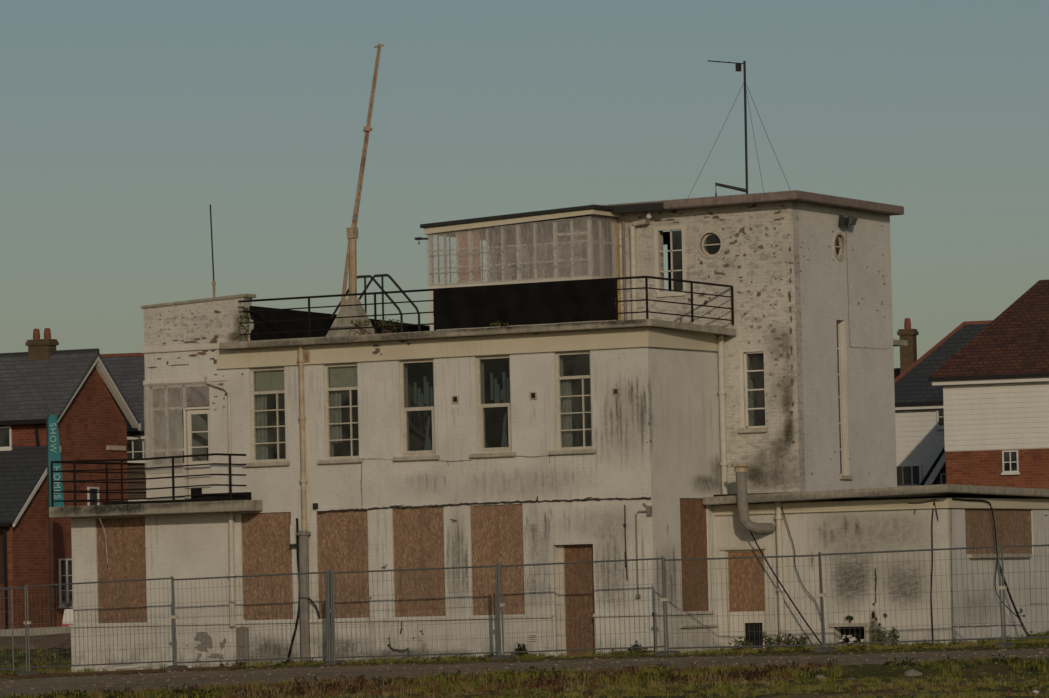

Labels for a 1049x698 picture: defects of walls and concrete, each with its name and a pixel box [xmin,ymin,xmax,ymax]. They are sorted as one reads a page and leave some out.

spalling [148,310,227,410]
peeling [700,205,810,414]